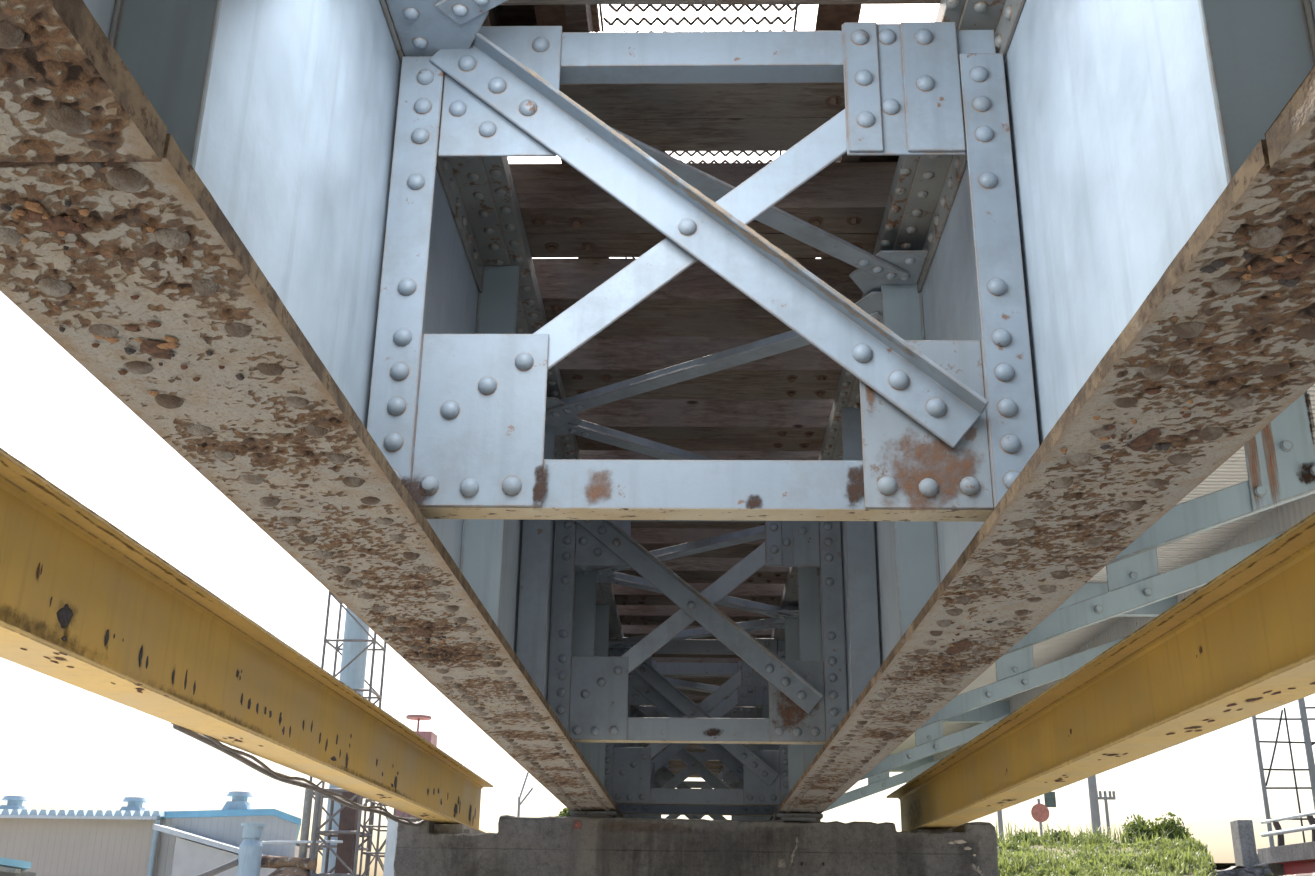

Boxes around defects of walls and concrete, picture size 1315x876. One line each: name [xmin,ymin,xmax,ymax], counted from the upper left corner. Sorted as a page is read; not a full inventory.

peeling [1,200,100,265]
peeling [1200,260,1226,274]
peeling [91,322,200,382]
rust [533,466,548,506]
rust [586,473,610,501]
rust [847,466,864,506]
rust [894,438,975,509]
peeling [43,596,74,668]
peeling [236,669,352,768]
rust [778,692,806,726]
peeling [1166,682,1315,735]
peeling [420,788,476,826]